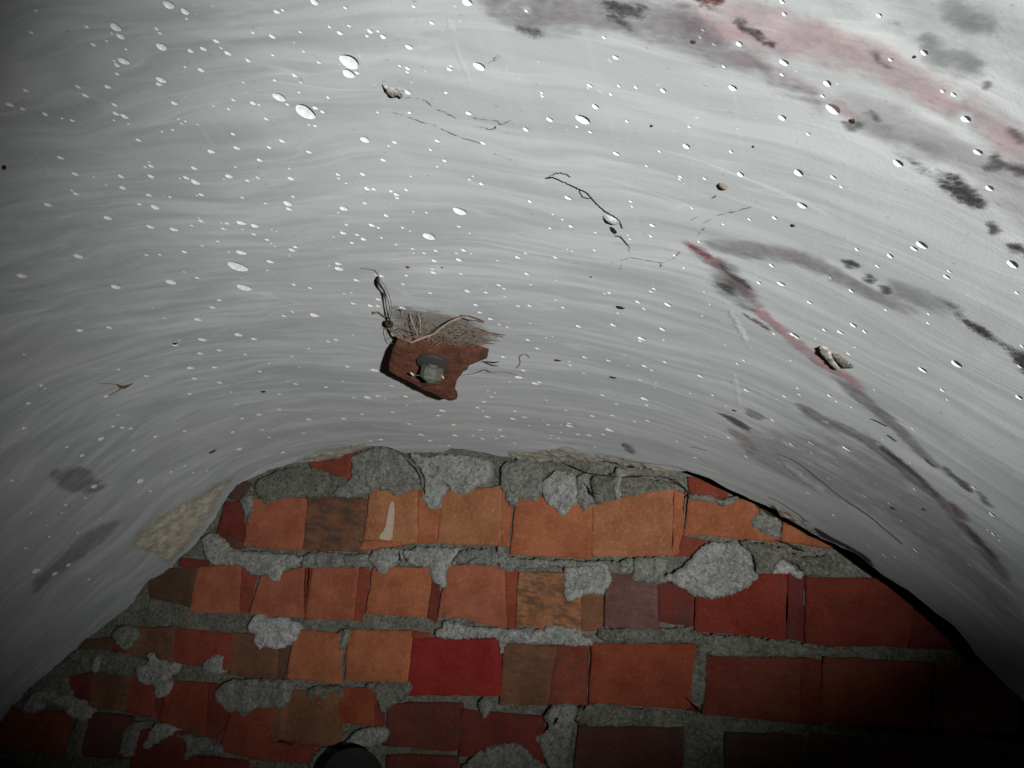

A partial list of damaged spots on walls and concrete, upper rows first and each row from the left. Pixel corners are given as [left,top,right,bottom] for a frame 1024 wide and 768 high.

leakage [517,0,748,66]
leakage [736,20,774,47]
crack [547,172,681,263]
leakage [687,242,895,304]
leakage [950,303,1024,366]
spalling [281,439,383,463]
leakage [723,414,750,430]
leakage [745,309,994,507]
leakage [799,404,1009,578]